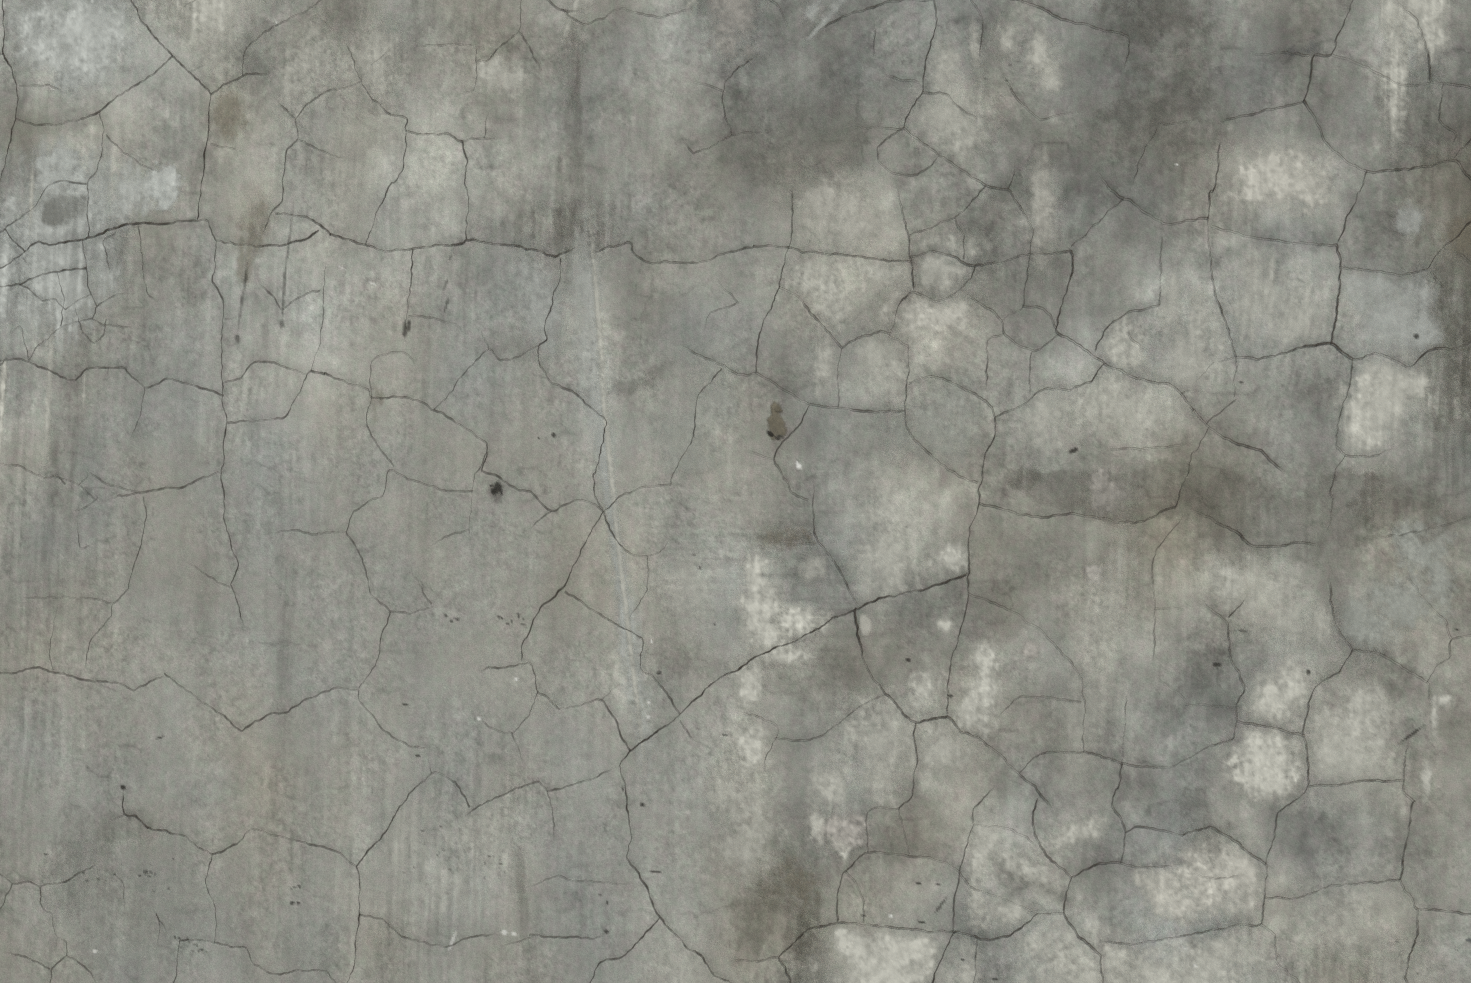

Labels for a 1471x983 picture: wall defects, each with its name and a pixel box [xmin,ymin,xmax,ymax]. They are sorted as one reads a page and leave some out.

leakage [922,35,980,154]
crack [882,5,1022,222]
leakage [1000,27,1061,91]
crack [1229,12,1471,178]
leakage [1032,171,1053,244]
crack [1107,147,1233,231]
crack [0,0,644,709]
crack [452,196,1471,983]
leakage [1211,524,1452,645]
crack [215,688,416,747]
crack [122,796,237,883]
crack [277,785,482,973]